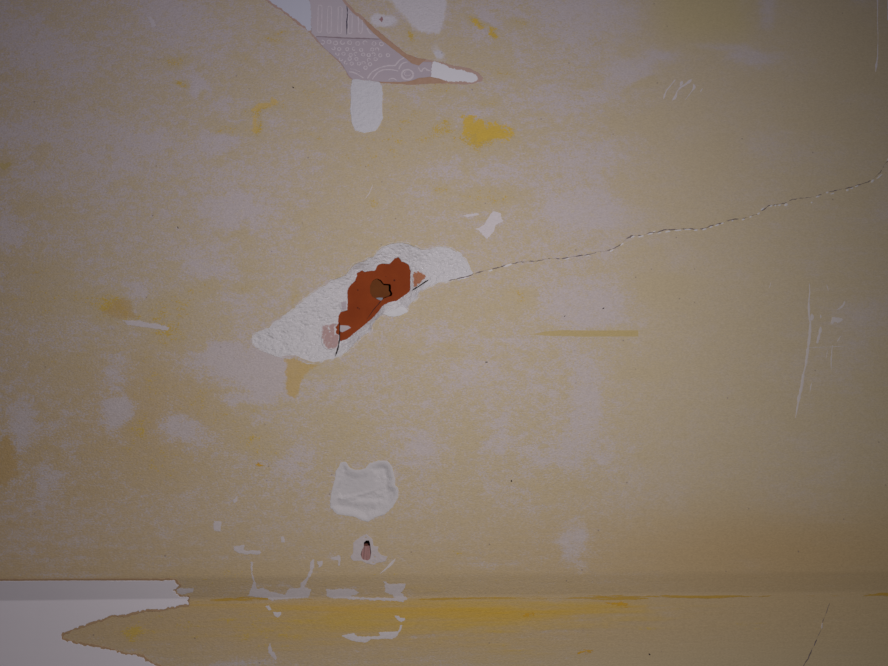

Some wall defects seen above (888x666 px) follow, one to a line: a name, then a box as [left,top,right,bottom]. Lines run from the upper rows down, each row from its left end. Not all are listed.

peeling [266,0,483,85]
water stain [452,107,519,148]
peeling [463,211,503,239]
crack [449,159,888,281]
spalling [251,242,473,364]
water stain [0,429,26,492]
spalling [330,460,398,522]
peeling [0,578,194,666]
peeling [234,534,388,618]
peeling [326,581,408,602]
peeling [342,616,405,643]